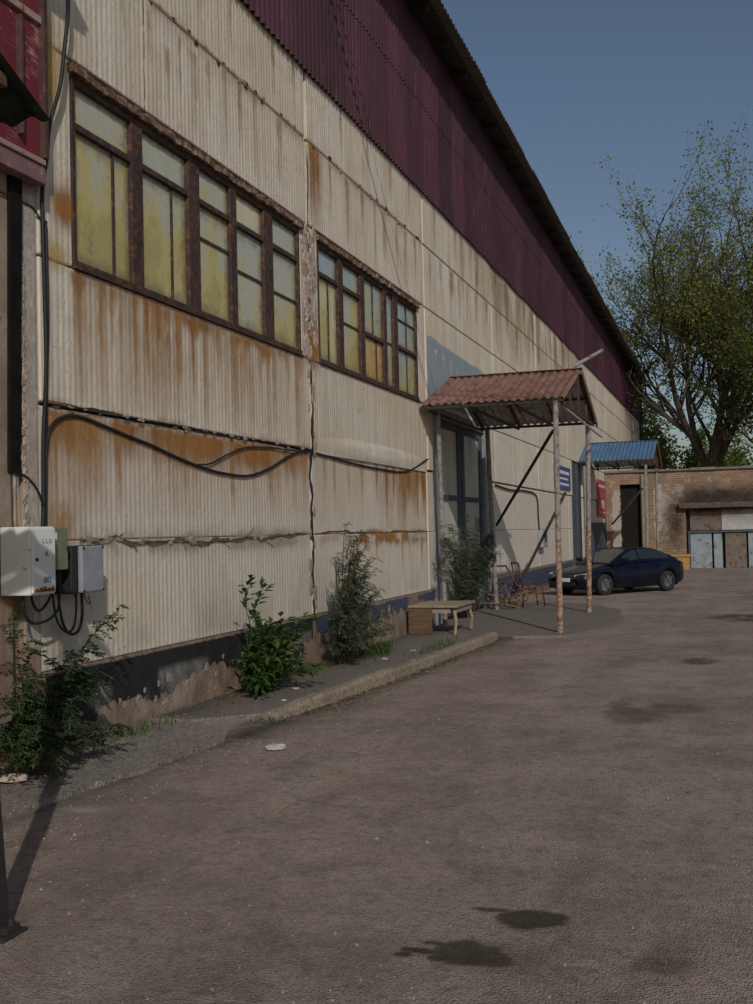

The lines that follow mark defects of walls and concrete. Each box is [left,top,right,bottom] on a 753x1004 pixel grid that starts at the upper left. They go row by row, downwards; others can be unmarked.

rust [55,191,72,223]
rust [73,274,83,318]
rust [99,286,219,372]
rust [48,411,101,472]
rust [152,428,307,486]
crack [80,362,421,616]
rust [376,465,426,499]
rust [356,530,427,551]
peeling [357,591,435,631]
peeling [46,614,336,725]
damp [475,907,568,928]
damp [433,940,513,967]